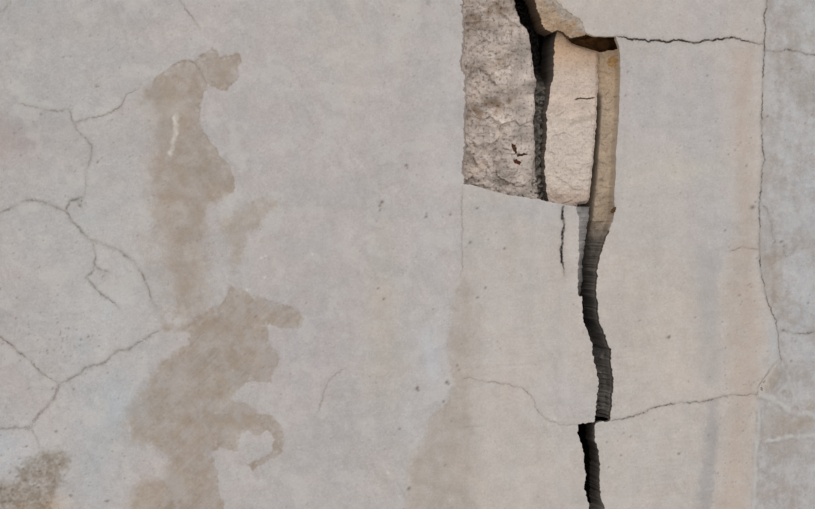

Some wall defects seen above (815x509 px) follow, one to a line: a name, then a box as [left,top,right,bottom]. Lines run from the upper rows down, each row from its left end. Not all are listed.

crack [0,89,163,448]
water stain [123,46,243,324]
spalling [459,0,619,221]
crack [462,0,815,509]
water stain [119,473,172,509]